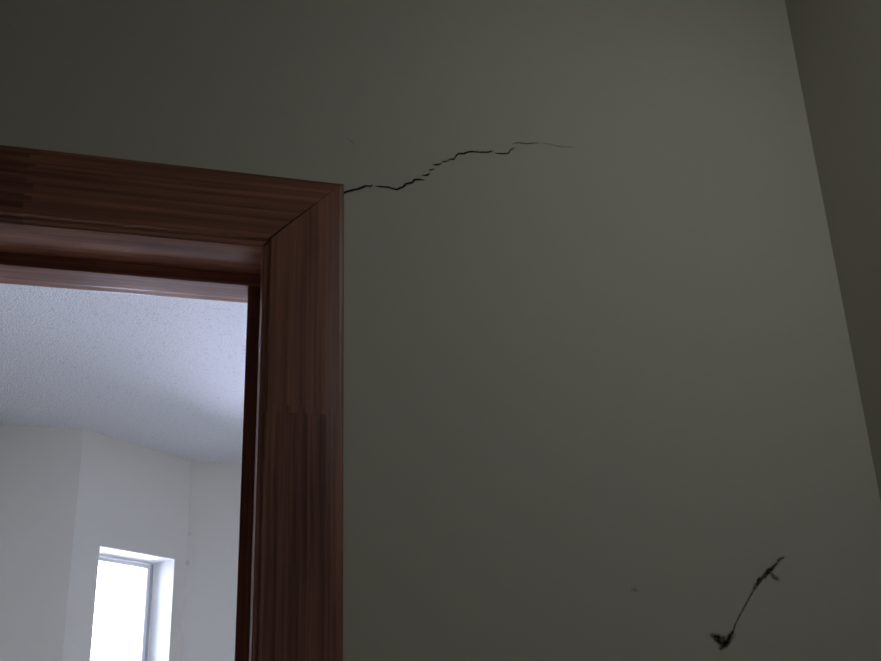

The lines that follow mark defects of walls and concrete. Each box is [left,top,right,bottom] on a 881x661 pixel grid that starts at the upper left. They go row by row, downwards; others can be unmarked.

crack [344,142,538,193]
crack [713,560,779,647]